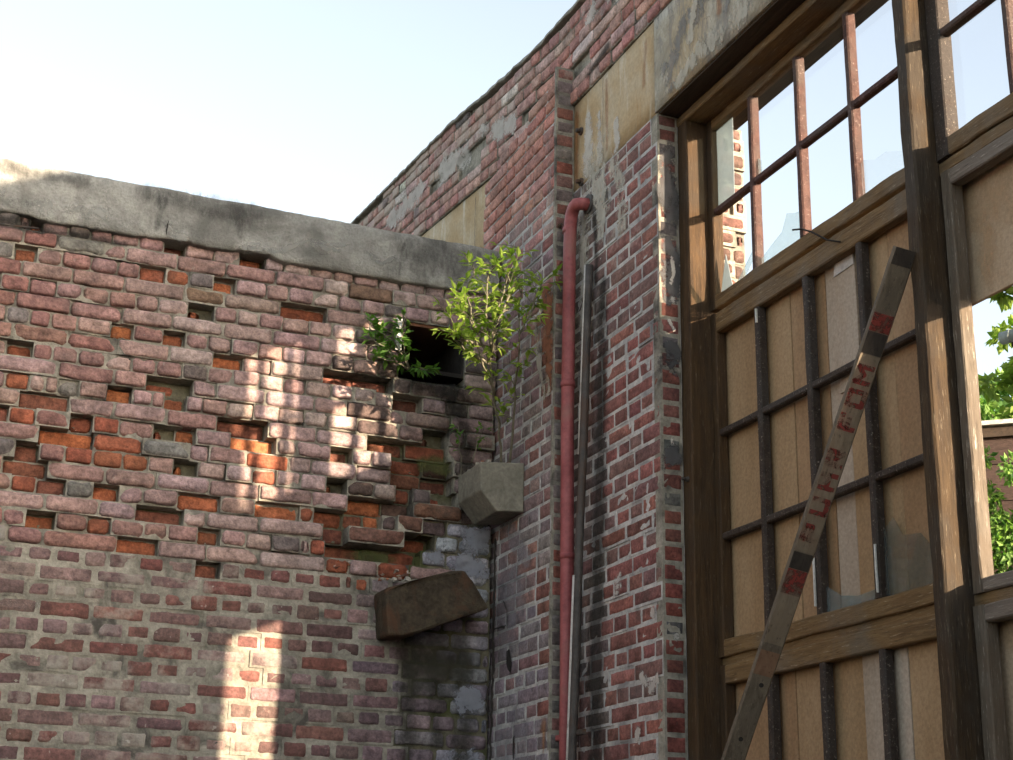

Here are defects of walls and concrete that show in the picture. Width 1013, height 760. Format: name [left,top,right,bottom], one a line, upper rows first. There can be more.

spalling [187,308,212,321]
spalling [280,306,324,323]
spalling [6,344,33,357]
spalling [146,381,190,411]
spalling [323,375,418,413]
spalling [0,392,93,496]
spalling [216,421,273,454]
spalling [173,464,195,477]
spalling [135,494,219,525]
spalling [254,503,298,521]
spalling [313,435,491,580]
spalling [116,538,157,556]